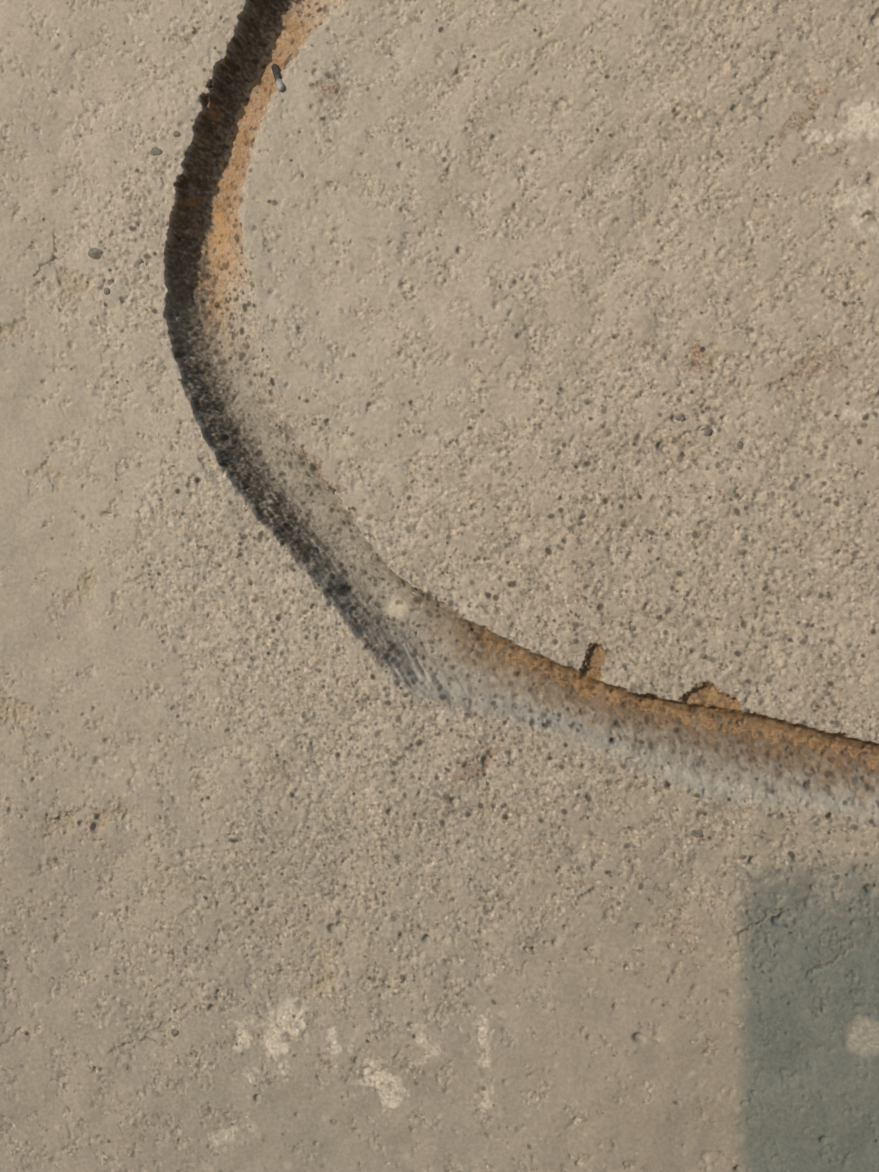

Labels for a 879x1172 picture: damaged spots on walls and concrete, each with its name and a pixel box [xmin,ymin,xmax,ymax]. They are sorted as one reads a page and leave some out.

spalling [200,92,223,123]
rust [201,0,348,364]
spalling [574,643,607,700]
rust [375,559,879,799]
spalling [679,681,744,719]